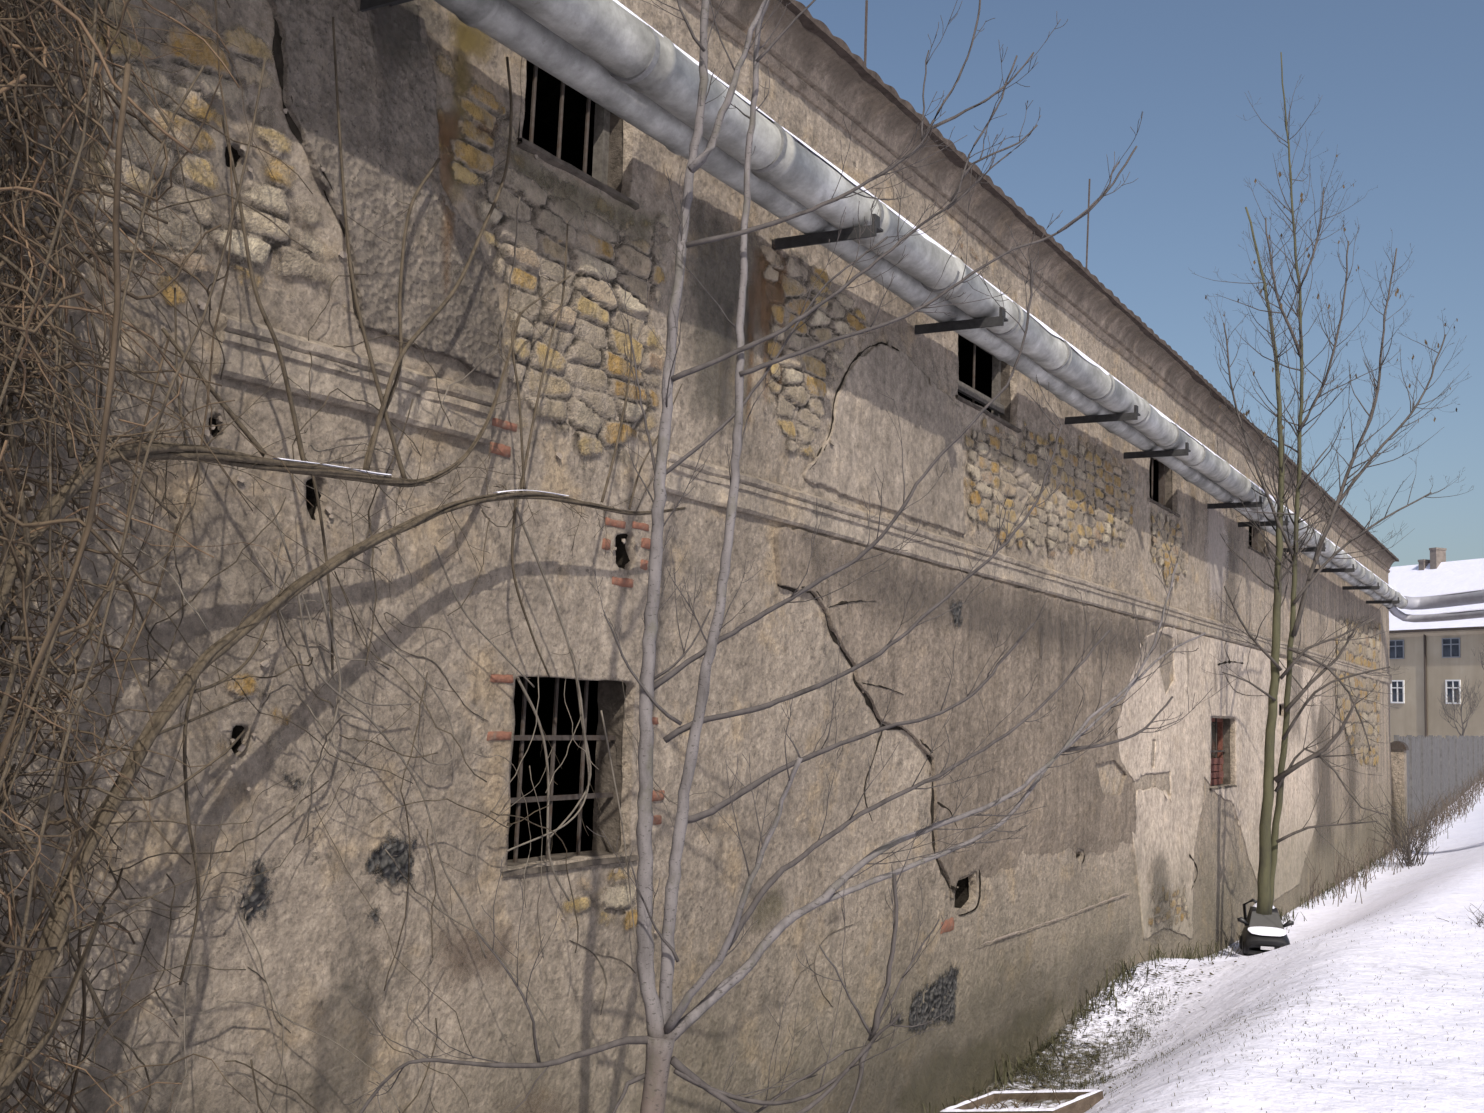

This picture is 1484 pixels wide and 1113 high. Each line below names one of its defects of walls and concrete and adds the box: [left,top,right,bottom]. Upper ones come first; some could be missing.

crack [272,18,361,328]
flaking render [62,0,670,467]
flaking render [602,517,651,588]
flaking render [755,231,1187,588]
crack [778,584,958,891]
spalling [894,966,959,1033]